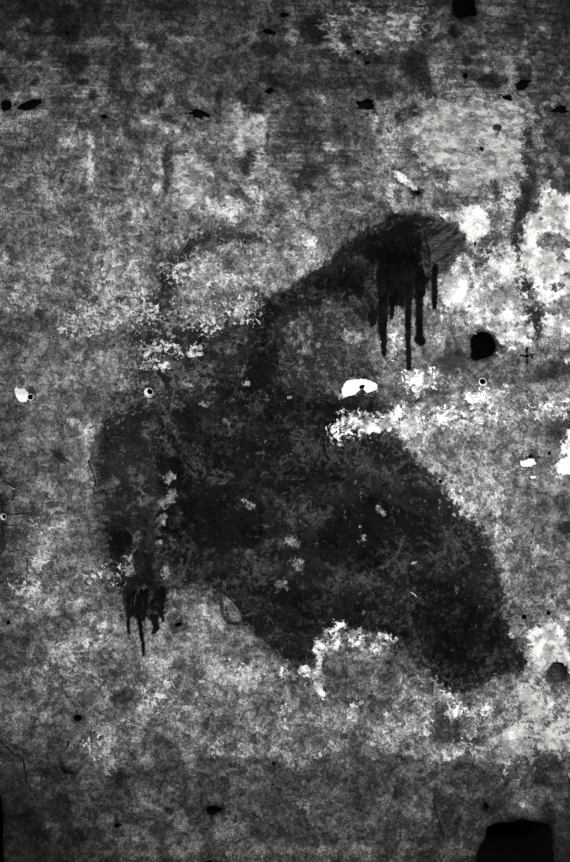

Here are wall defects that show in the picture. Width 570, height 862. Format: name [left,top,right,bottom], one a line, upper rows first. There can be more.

water stain [58,213,570,765]
water stain [7,517,63,611]
water stain [80,723,117,775]